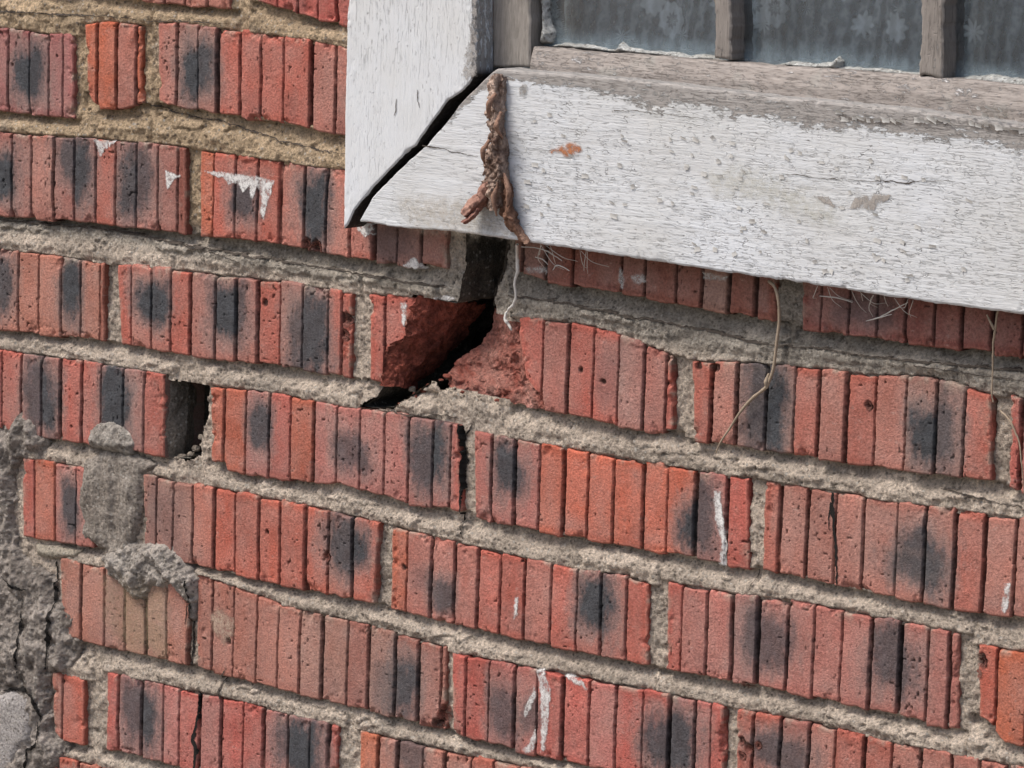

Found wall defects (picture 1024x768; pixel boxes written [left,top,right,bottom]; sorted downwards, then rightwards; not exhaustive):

peeling [835,110,954,127]
peeling [967,105,1024,135]
peeling [818,190,891,263]
spalling [380,295,544,409]
crack [0,219,1024,539]
crack [1,561,59,768]
crack [191,669,228,768]